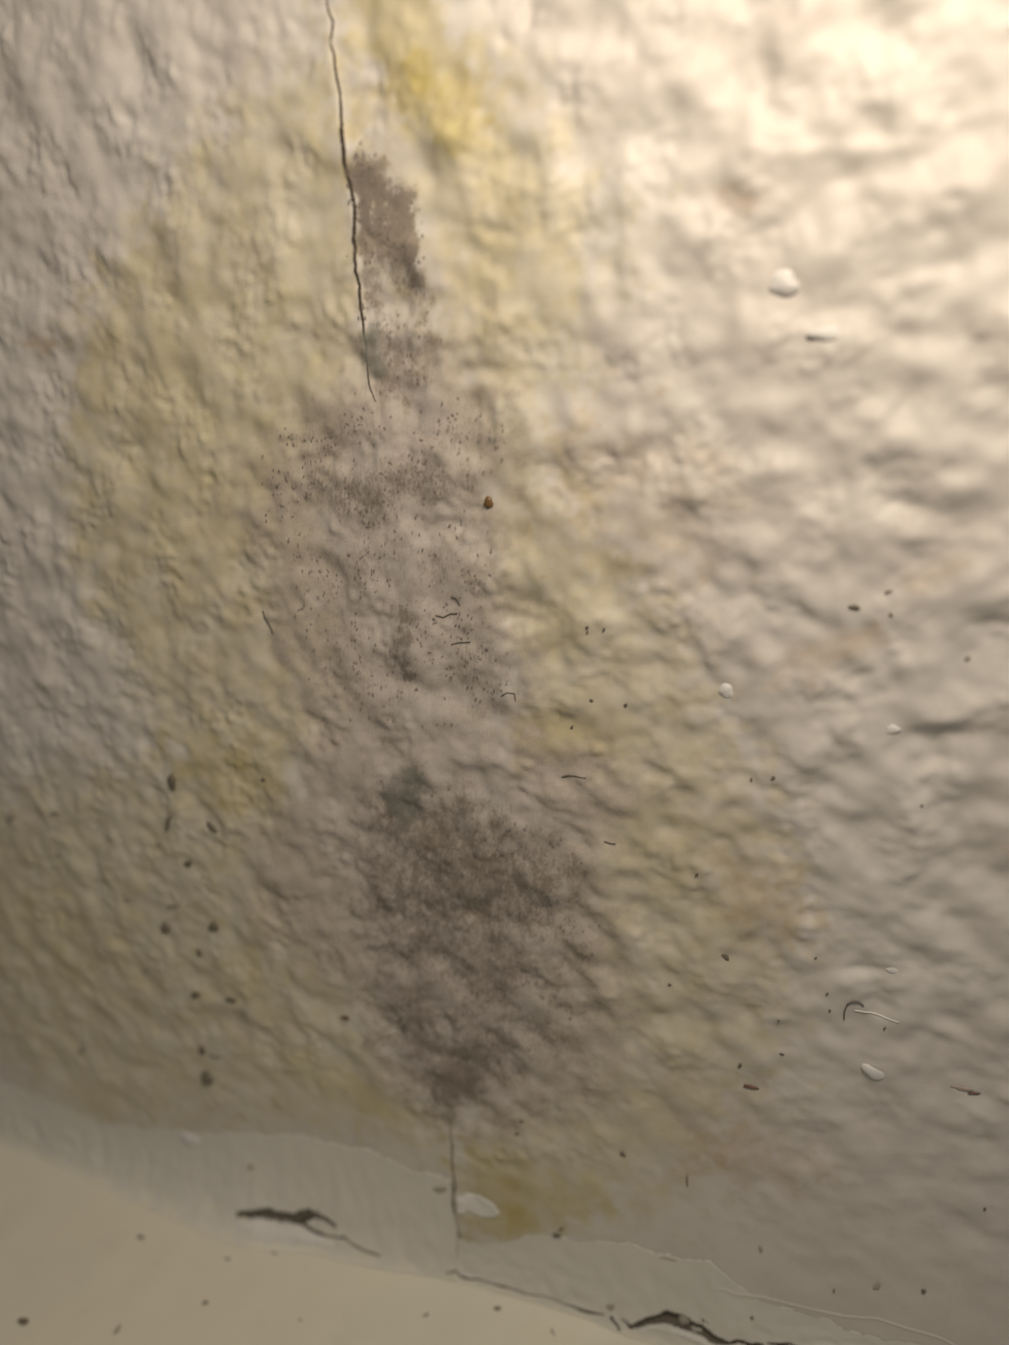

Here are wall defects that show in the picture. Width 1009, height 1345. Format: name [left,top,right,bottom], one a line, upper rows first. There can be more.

crack [326,0,376,402]
water stain [259,140,631,1117]
crack [446,1114,633,1331]
crack [726,1337,794,1345]